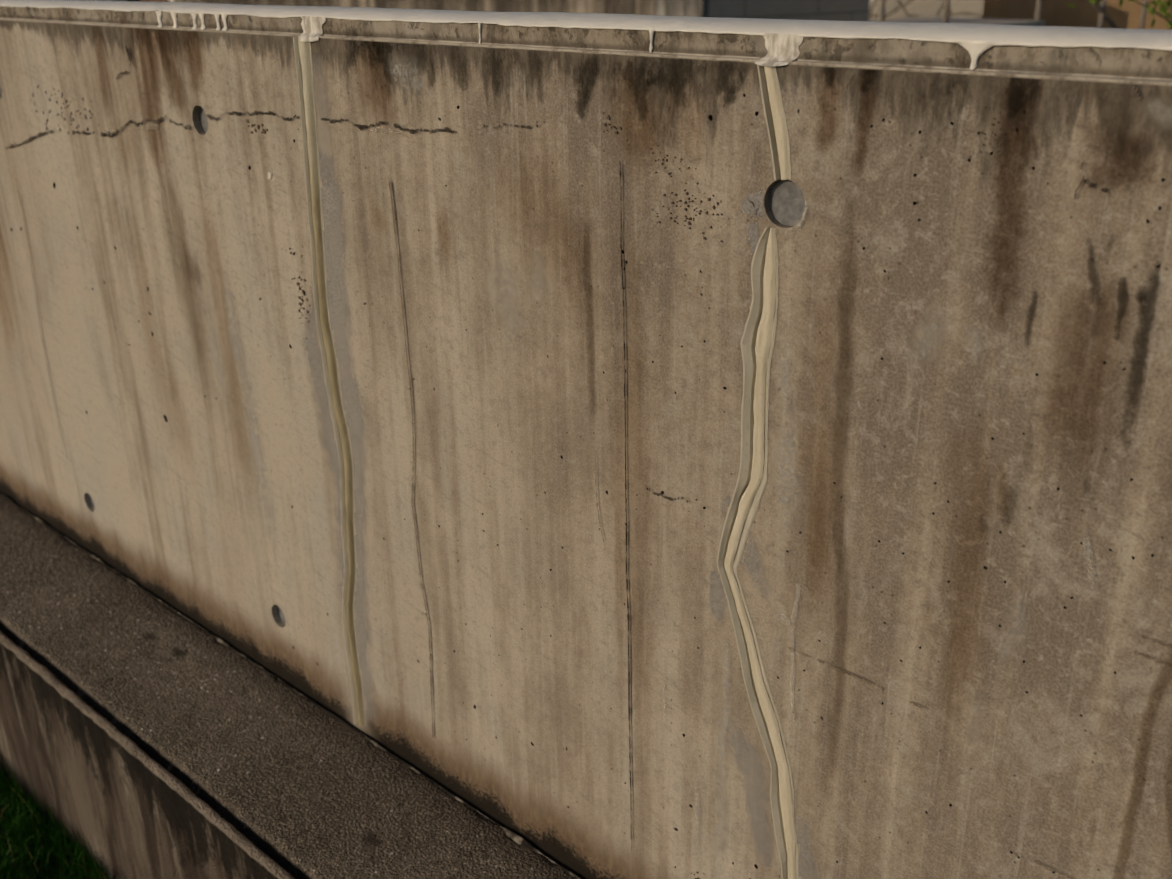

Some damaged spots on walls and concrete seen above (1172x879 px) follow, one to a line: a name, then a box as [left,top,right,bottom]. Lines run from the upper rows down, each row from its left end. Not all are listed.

crack [6,37,454,738]
crack [595,162,688,840]
crack [716,228,799,879]
crack [757,61,791,180]